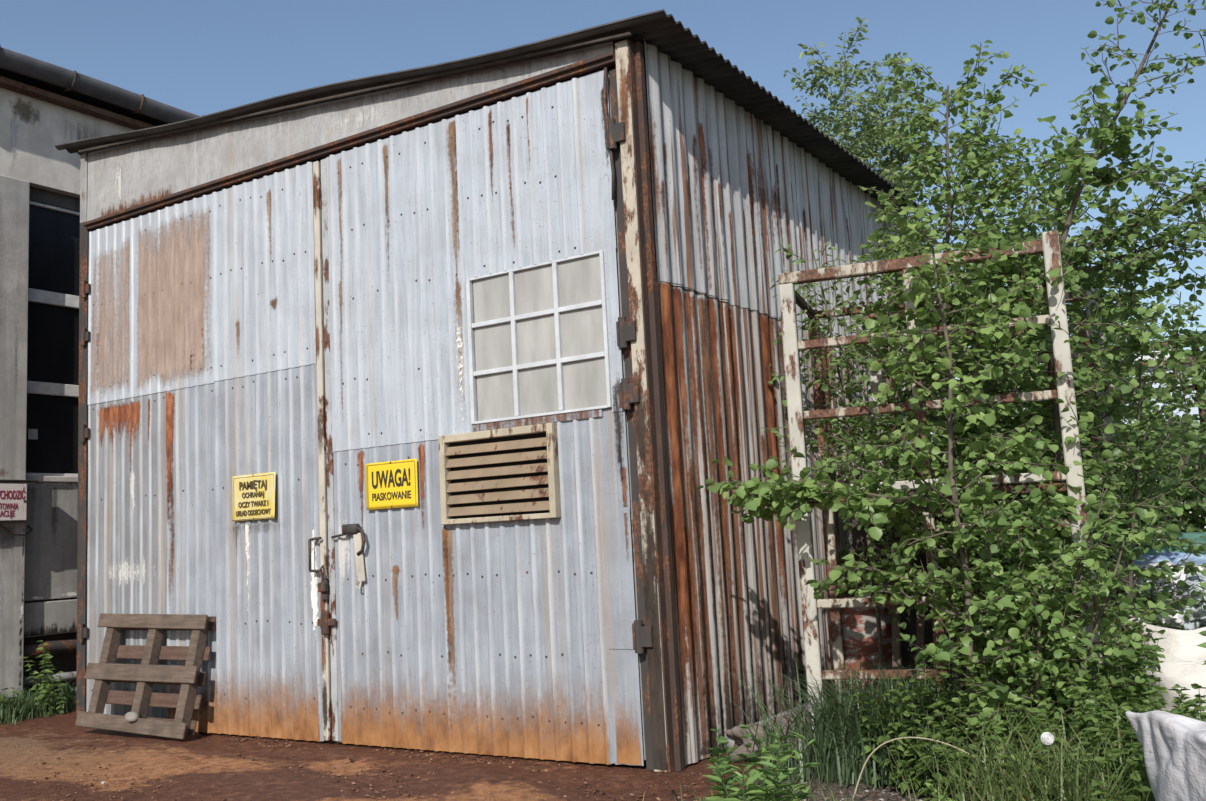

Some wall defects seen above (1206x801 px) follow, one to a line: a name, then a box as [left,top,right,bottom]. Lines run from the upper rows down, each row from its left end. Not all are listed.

corrosion [448,121,462,330]
corrosion [506,124,514,238]
corrosion [99,399,150,471]
corrosion [166,392,175,587]
corrosion [651,116,835,743]
corrosion [442,527,455,681]